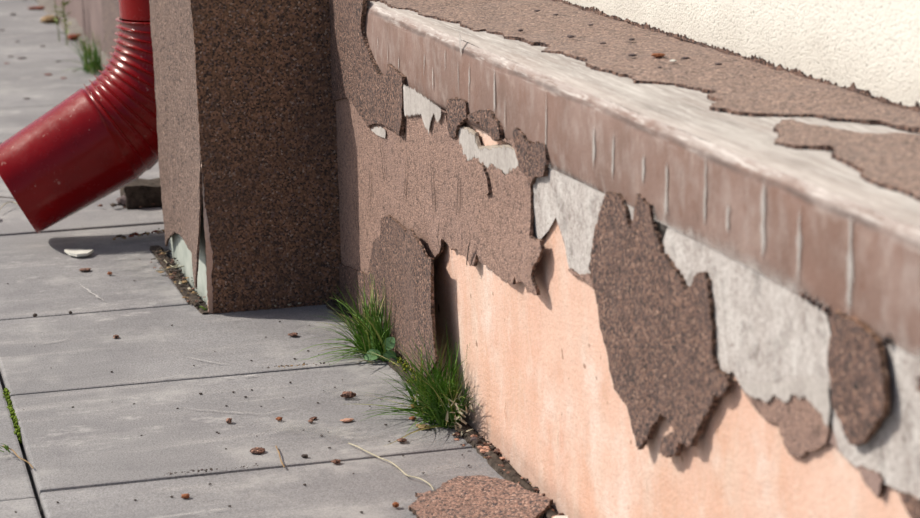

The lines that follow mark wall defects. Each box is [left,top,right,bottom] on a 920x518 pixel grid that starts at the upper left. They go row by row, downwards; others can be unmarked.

spalling [329,0,920,518]